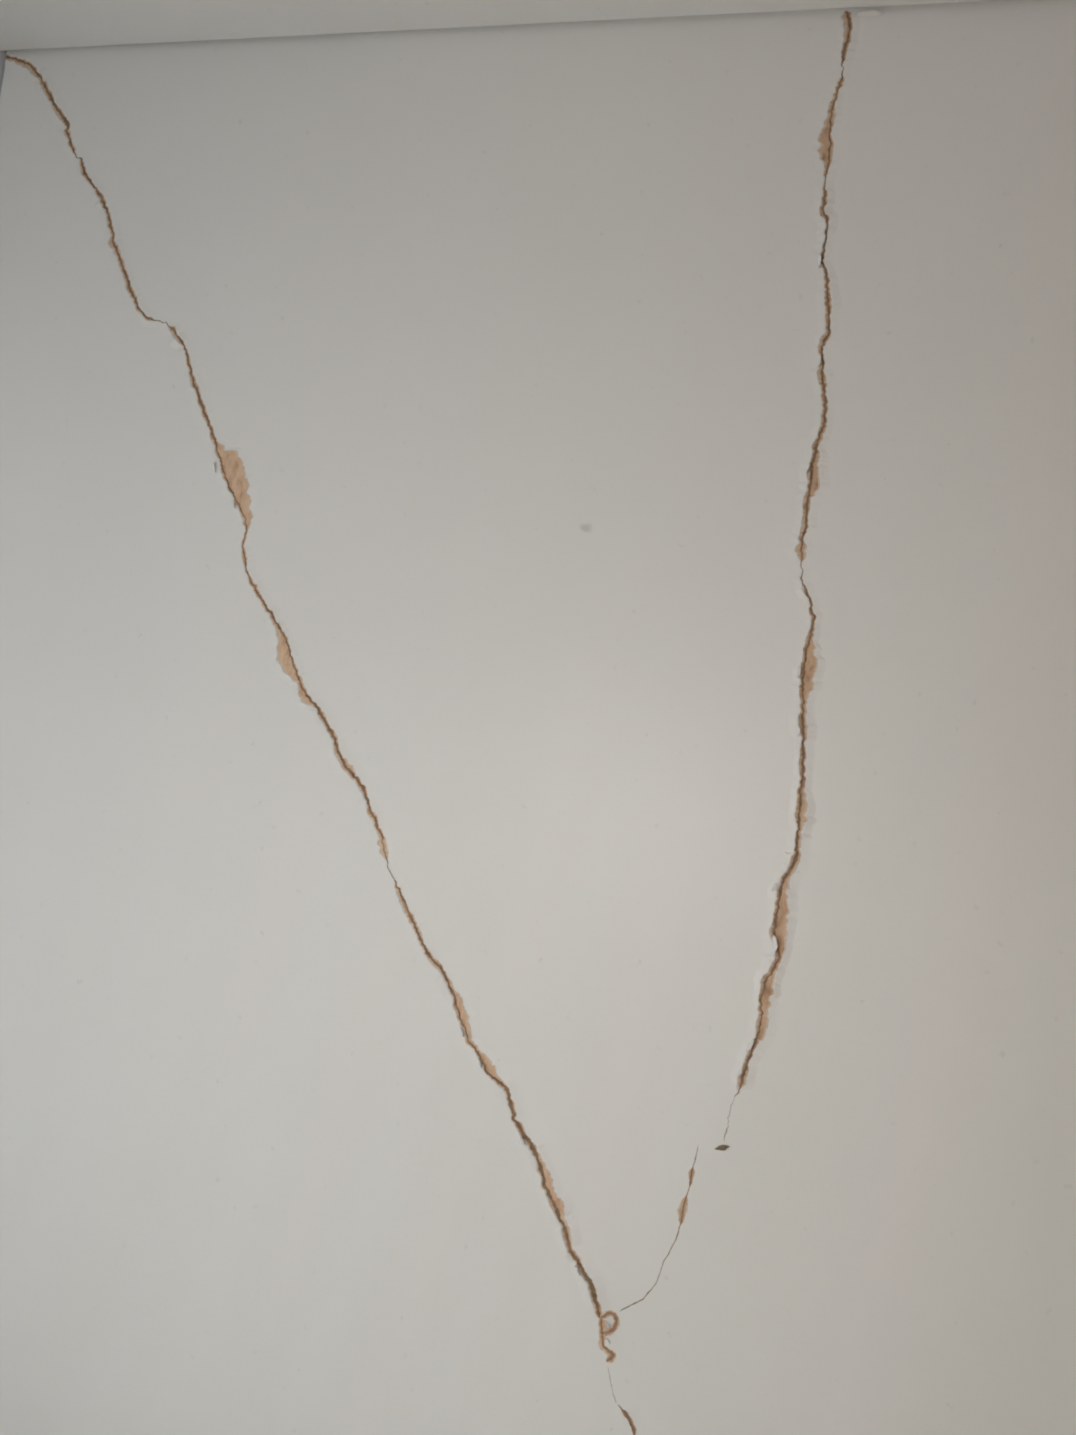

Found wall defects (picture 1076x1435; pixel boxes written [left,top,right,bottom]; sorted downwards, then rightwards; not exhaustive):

crack [5,9,860,1435]